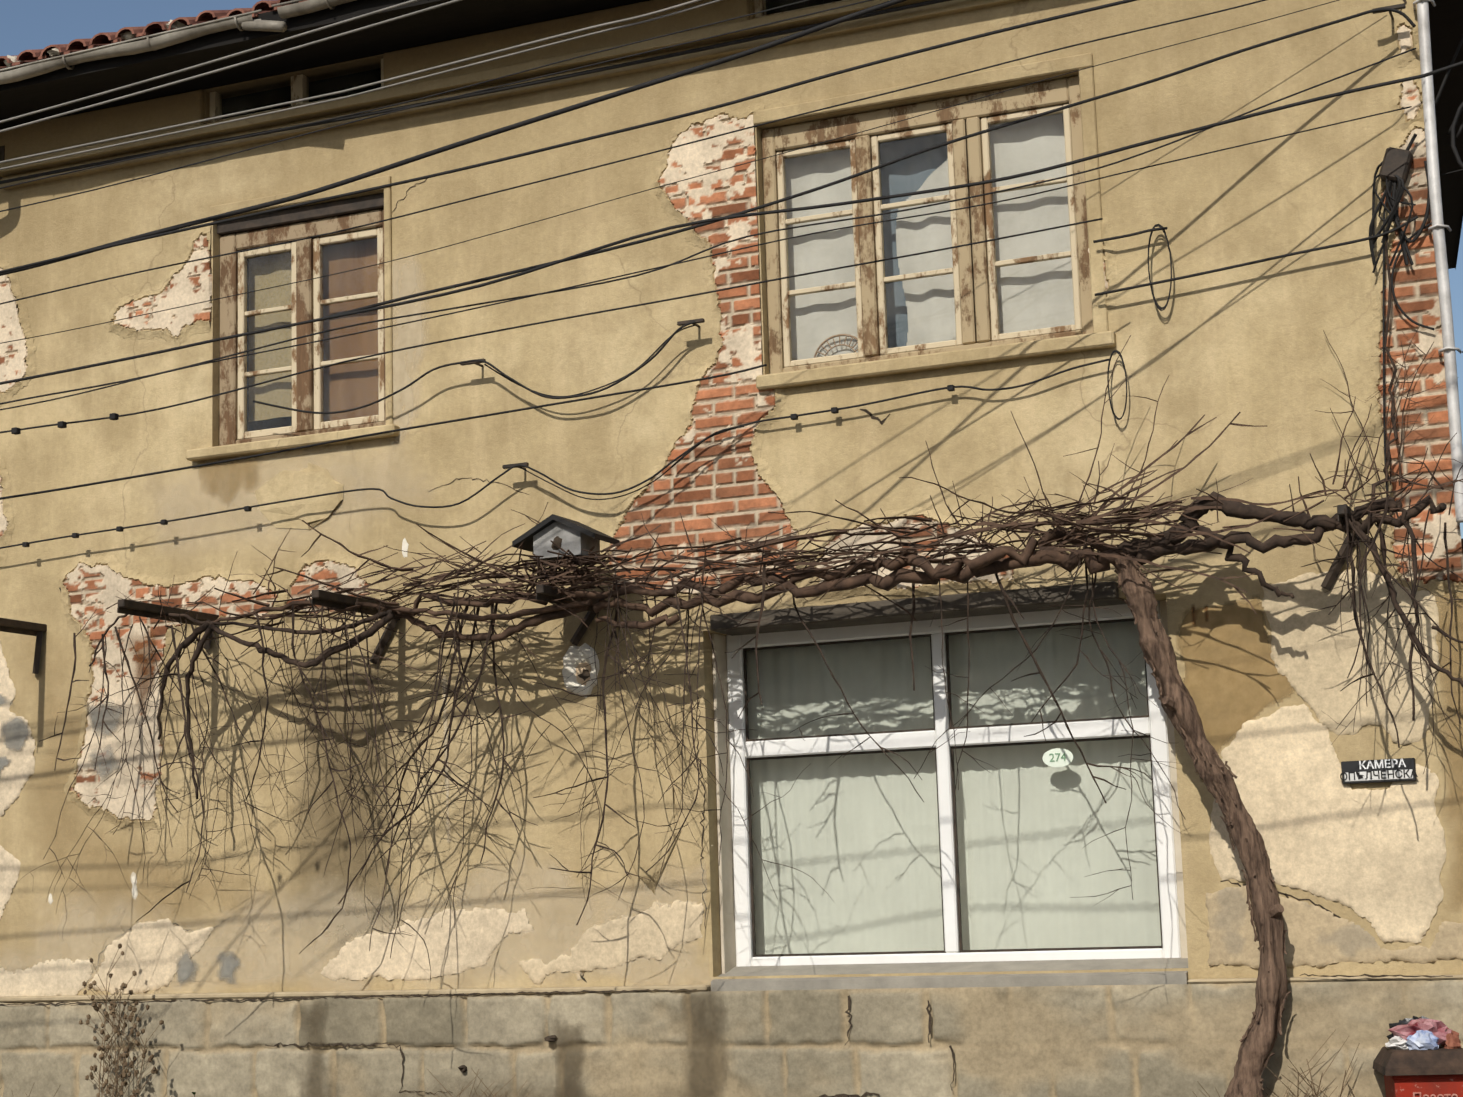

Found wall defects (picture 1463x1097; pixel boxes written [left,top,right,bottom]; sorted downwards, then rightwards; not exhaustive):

flaking render [0,259,36,406]
flaking render [104,222,212,348]
flaking render [600,102,1025,609]
flaking render [0,453,15,567]
peeling [1221,12,1463,968]
peeling [0,644,36,817]
flaking render [55,549,380,834]
peeling [0,918,213,997]
peeling [321,907,535,981]
crack [845,995,853,1045]
crack [819,1089,880,1097]
peeling [1205,799,1260,969]